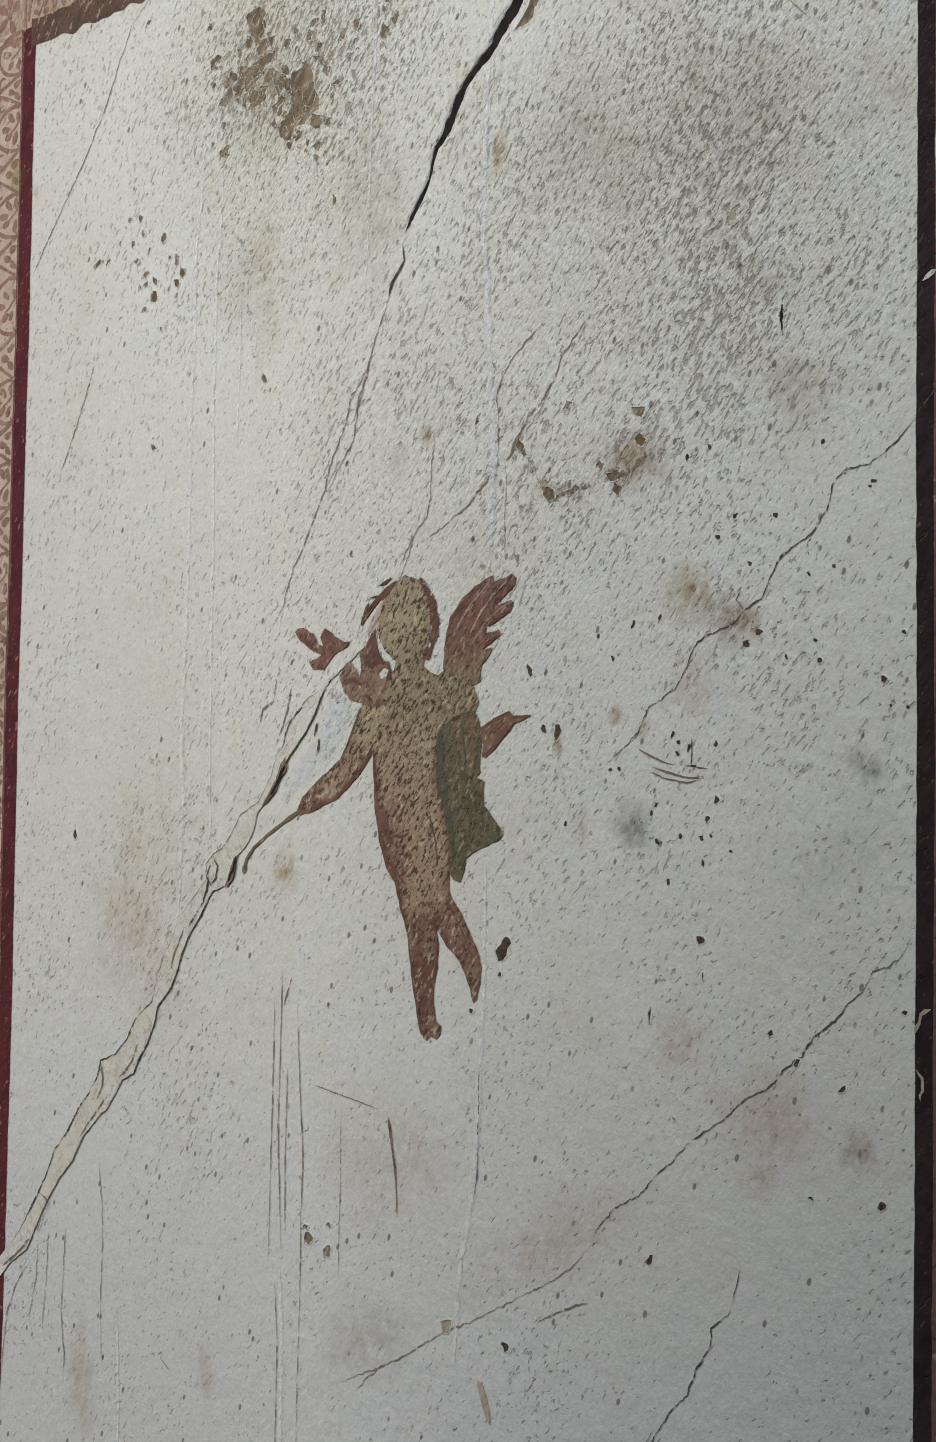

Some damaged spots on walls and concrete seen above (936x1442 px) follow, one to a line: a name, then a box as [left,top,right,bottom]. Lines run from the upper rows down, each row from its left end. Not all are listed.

crack [34,0,149,272]
flaking render [210,0,400,163]
crack [61,367,94,470]
crack [280,0,542,623]
crack [400,314,590,572]
crack [607,386,936,763]
crack [0,650,359,1383]
crack [345,940,910,1390]
crack [646,1270,740,1442]